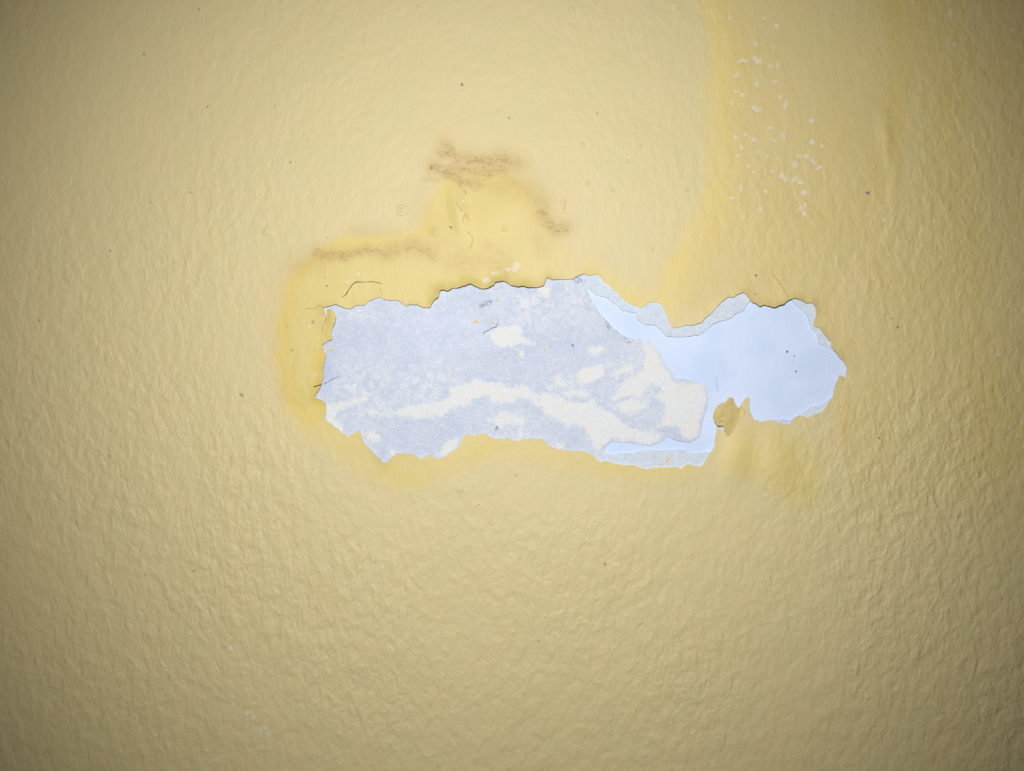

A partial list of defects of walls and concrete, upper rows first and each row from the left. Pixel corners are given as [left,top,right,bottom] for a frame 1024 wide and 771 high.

peeling [308,261,847,469]
water stain [262,0,1024,571]